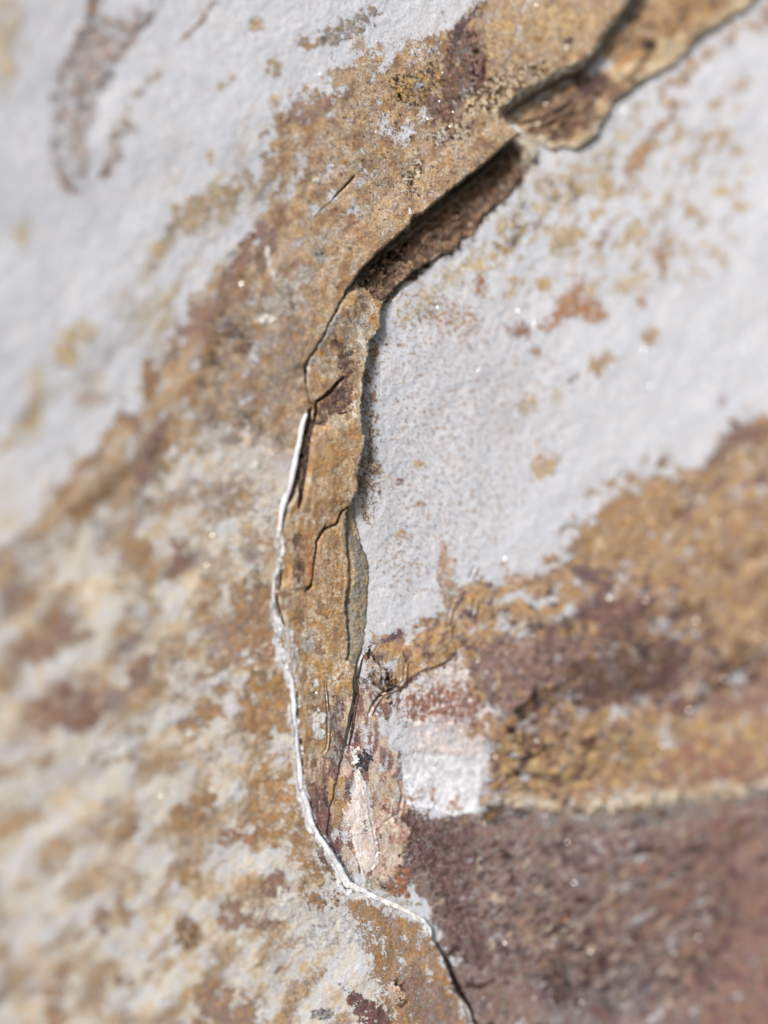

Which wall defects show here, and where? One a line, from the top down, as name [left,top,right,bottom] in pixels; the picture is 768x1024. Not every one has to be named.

crack [313,179,351,218]
crack [270,380,480,1024]